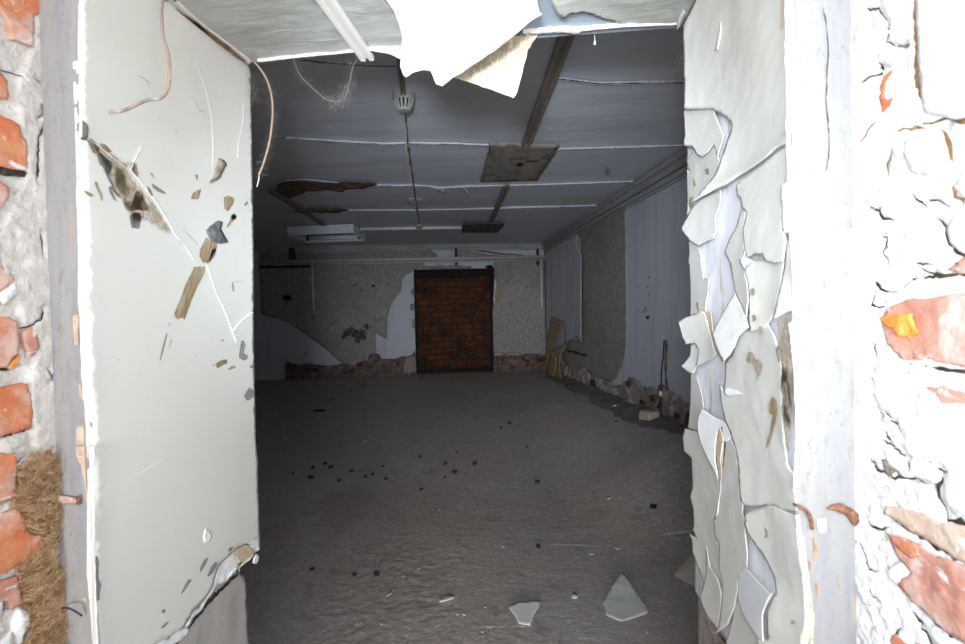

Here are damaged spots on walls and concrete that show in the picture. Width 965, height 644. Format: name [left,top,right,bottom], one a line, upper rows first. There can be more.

flaking render [0,0,40,47]
spalling [257,50,354,63]
flaking render [879,67,894,114]
flaking render [898,0,922,100]
flaking render [0,115,28,171]
damp [87,139,169,231]
flaking render [0,316,40,369]
peeling [368,0,818,644]
flaking render [879,293,965,368]
flaking render [0,383,33,437]
spalling [157,535,260,644]
flaking render [882,506,965,644]